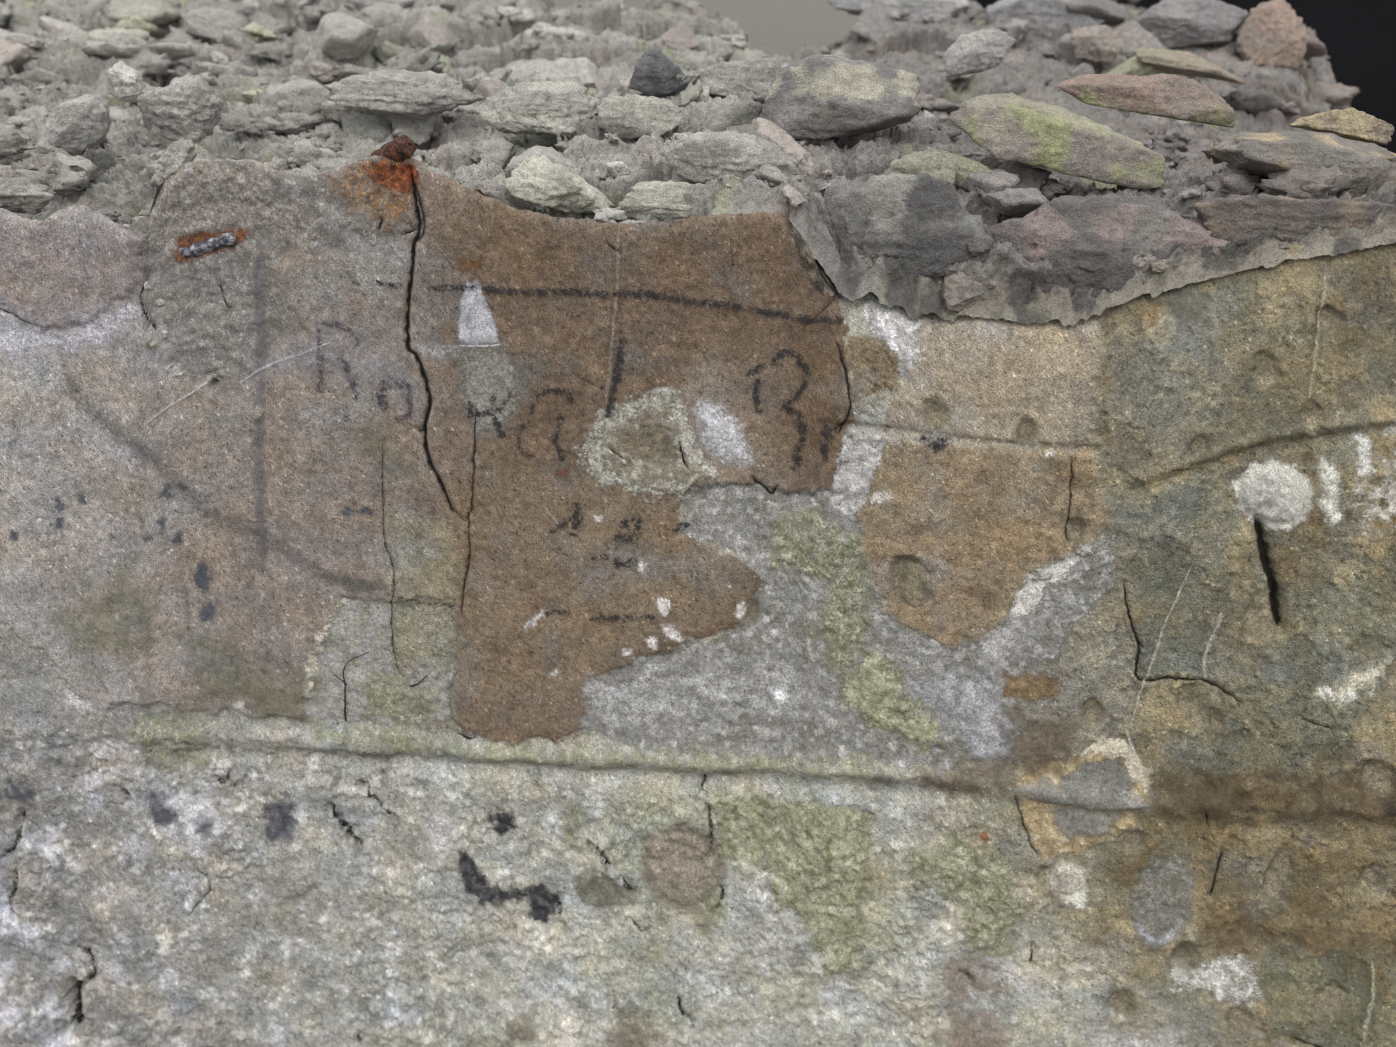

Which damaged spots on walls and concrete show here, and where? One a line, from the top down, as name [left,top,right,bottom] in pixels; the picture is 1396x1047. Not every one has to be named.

rust [173,225,250,263]
rust [325,157,424,221]
crack [379,169,476,615]
spalling [574,387,1116,778]